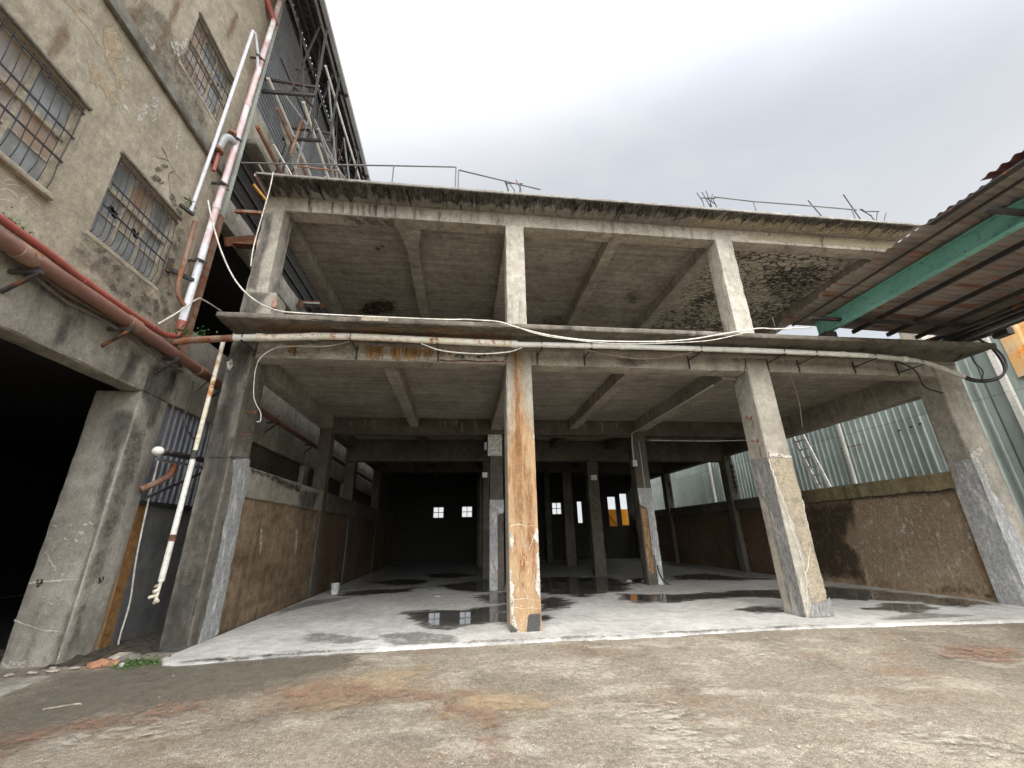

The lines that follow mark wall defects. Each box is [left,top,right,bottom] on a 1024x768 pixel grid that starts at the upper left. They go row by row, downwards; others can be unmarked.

damp [258,174,917,249]
corrosion [366,346,451,360]
corrosion [508,351,542,632]
corrosion [640,508,654,574]
damp [805,501,869,585]